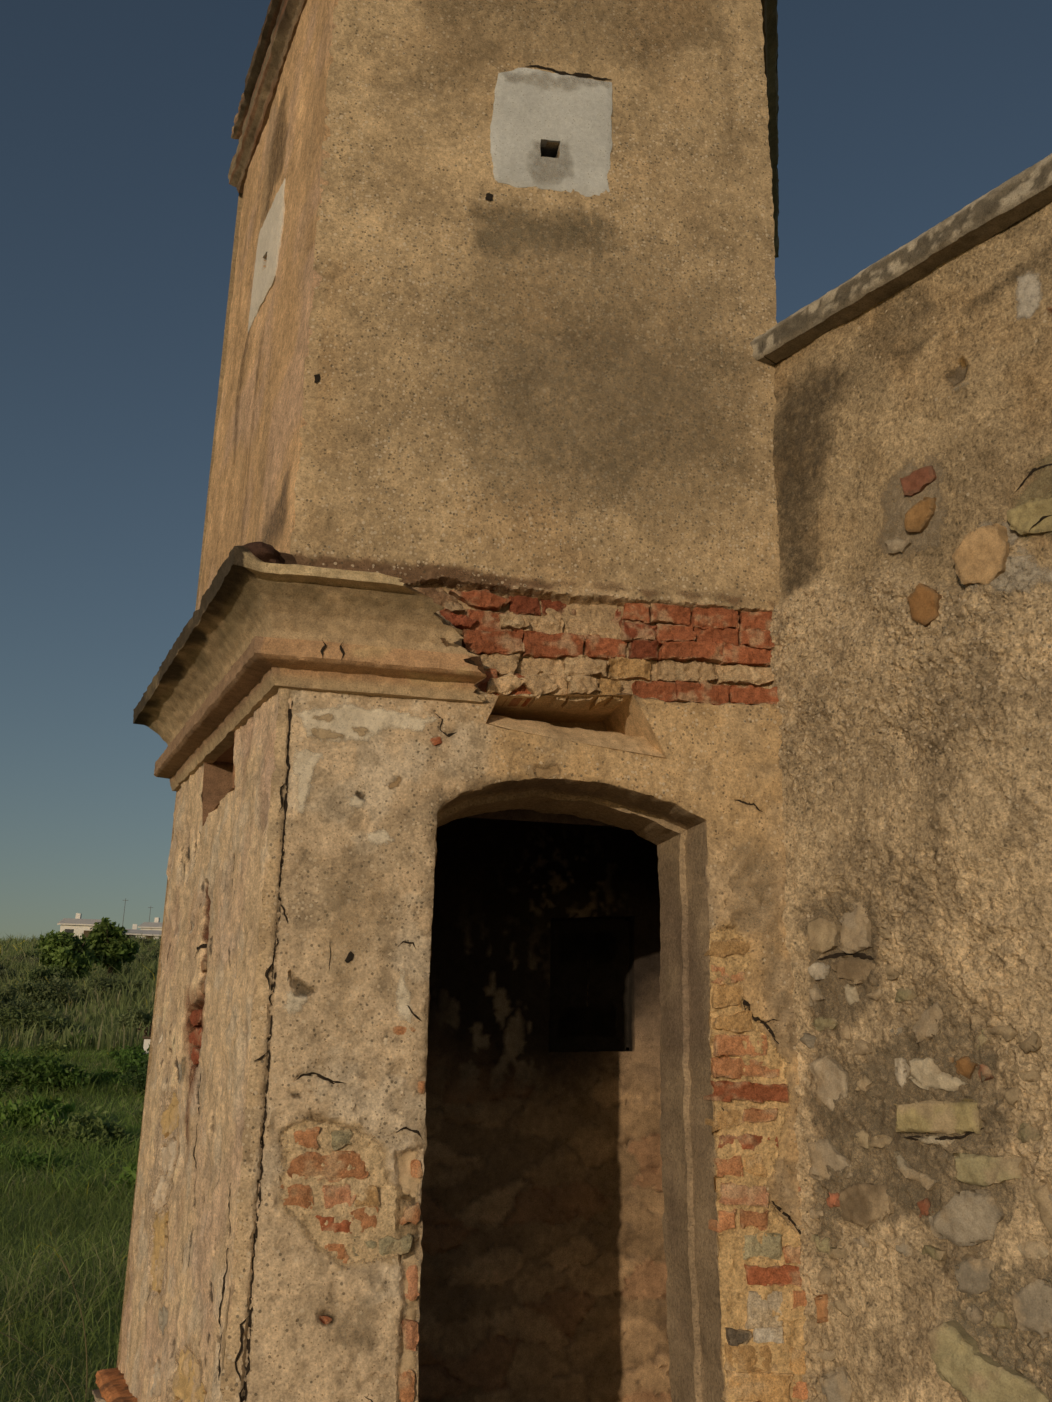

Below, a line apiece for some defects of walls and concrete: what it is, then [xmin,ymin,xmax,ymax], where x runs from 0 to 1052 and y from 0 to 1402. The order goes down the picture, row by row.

crack [1015,464,1052,492]
crack [218,701,347,1402]
flaking render [280,1119,423,1402]